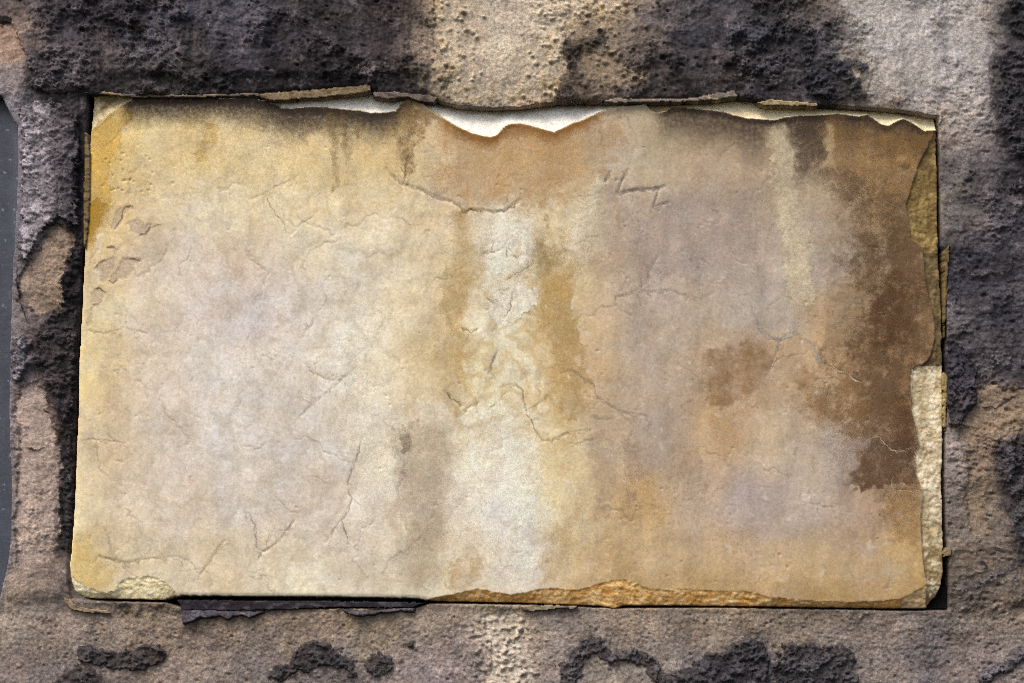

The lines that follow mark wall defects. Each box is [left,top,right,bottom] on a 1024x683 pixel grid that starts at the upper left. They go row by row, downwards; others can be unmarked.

spalling [269,91,405,113]
crack [606,174,665,209]
damp [769,125,815,303]
spalling [425,0,997,604]
spalling [71,575,180,600]
spalling [343,579,901,683]